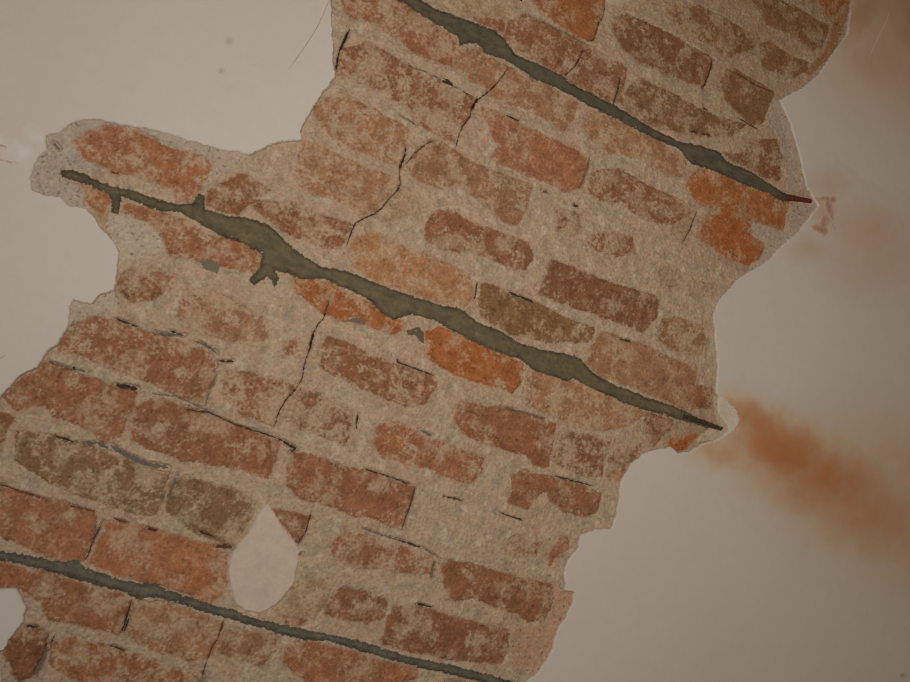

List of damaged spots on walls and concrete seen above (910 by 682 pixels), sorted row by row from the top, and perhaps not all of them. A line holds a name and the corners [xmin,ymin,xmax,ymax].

crack [455,67,509,149]
crack [346,141,433,247]
flaking render [422,0,852,411]
flaking render [56,316,219,412]
flaking render [3,360,282,480]
crack [275,297,330,424]
flaking render [454,369,673,481]
flaking render [13,428,257,549]
flaking render [283,441,416,530]
corrosion [659,368,910,644]
flaking render [0,559,477,682]
flaking render [441,558,555,624]